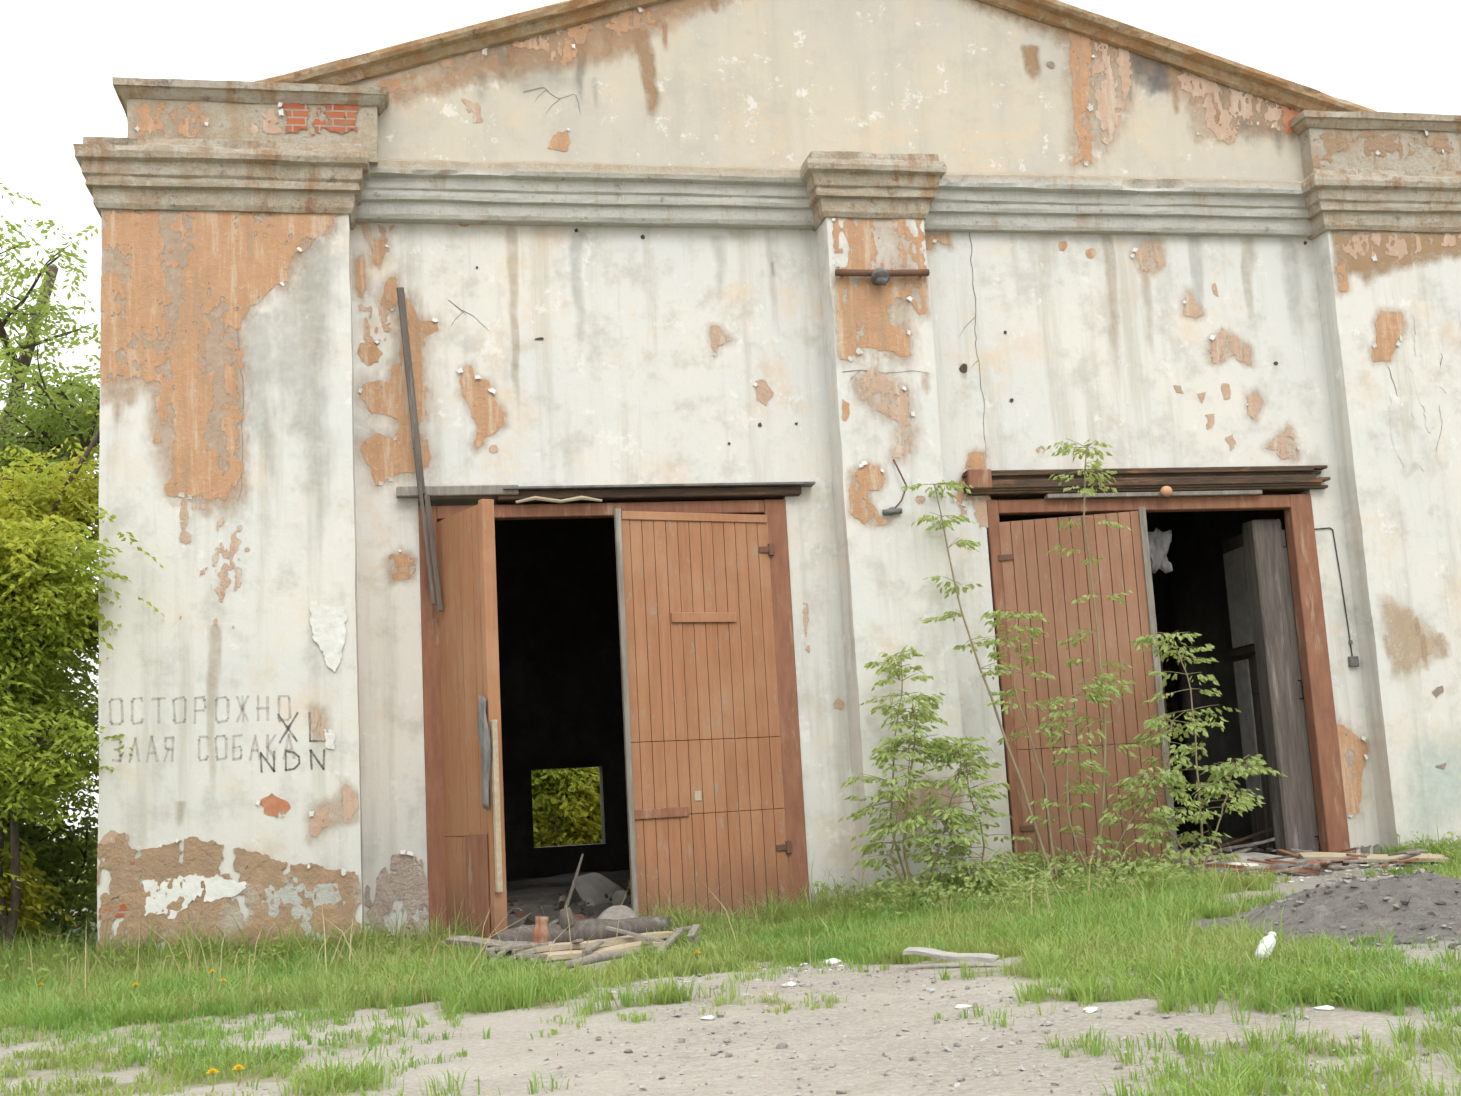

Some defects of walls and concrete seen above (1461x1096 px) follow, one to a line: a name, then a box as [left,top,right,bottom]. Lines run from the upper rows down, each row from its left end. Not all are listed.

flaking render [241,102,360,137]
leakage [635,31,658,110]
peeling [1069,31,1132,166]
peeling [1177,69,1302,144]
peeling [1334,231,1461,292]
peeling [100,209,337,628]
peeling [355,222,439,486]
peeling [456,365,505,453]
peeling [831,217,951,526]
peeling [1173,383,1263,451]
peeling [1372,311,1404,361]
spalling [97,830,429,956]